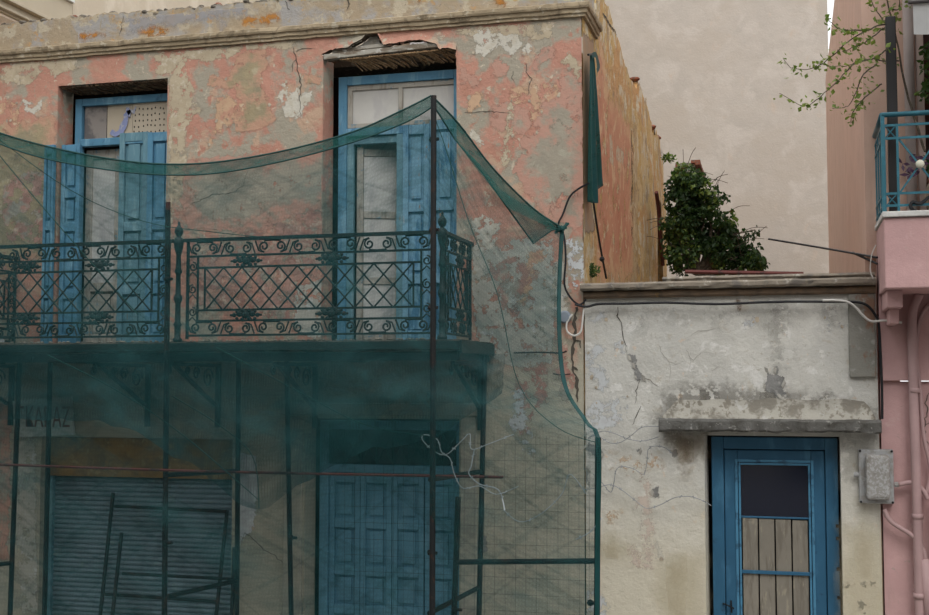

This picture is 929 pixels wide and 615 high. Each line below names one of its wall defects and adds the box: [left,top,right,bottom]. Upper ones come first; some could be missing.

crack [292,48,312,114]
spalling [321,22,553,83]
peeling [467,32,635,454]
crack [571,306,585,415]
spalling [614,340,646,382]